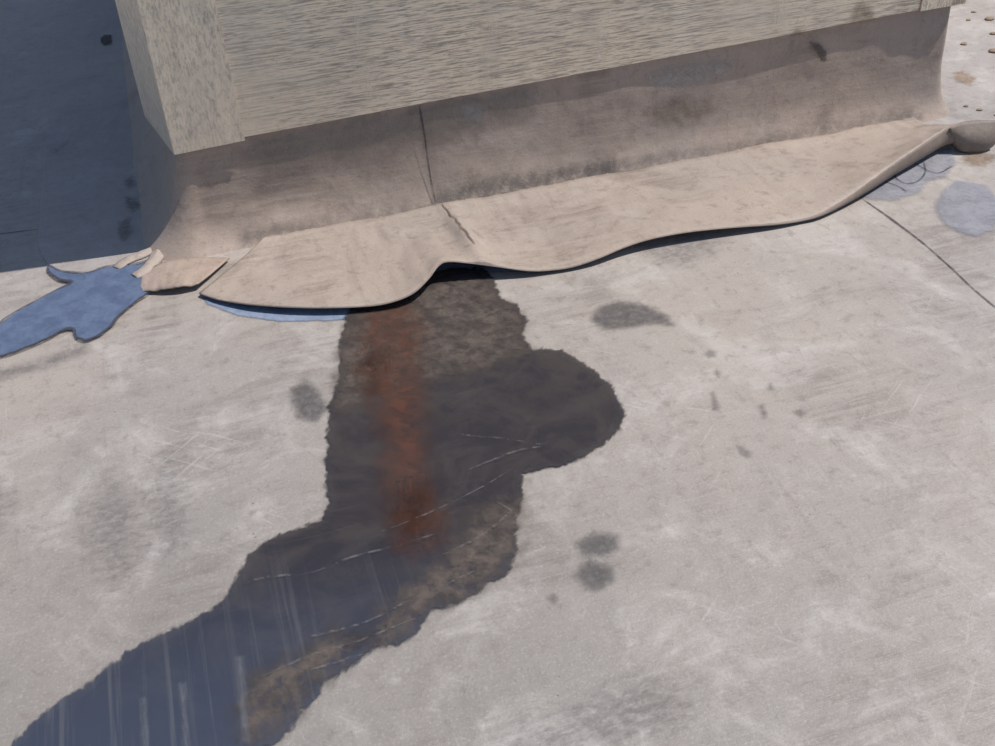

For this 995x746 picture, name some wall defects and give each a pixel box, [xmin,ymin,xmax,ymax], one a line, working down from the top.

leakage [813,44,826,62]
crack [420,110,474,242]
peeling [0,260,147,355]
leakage [595,303,667,327]
leakage [11,266,626,746]